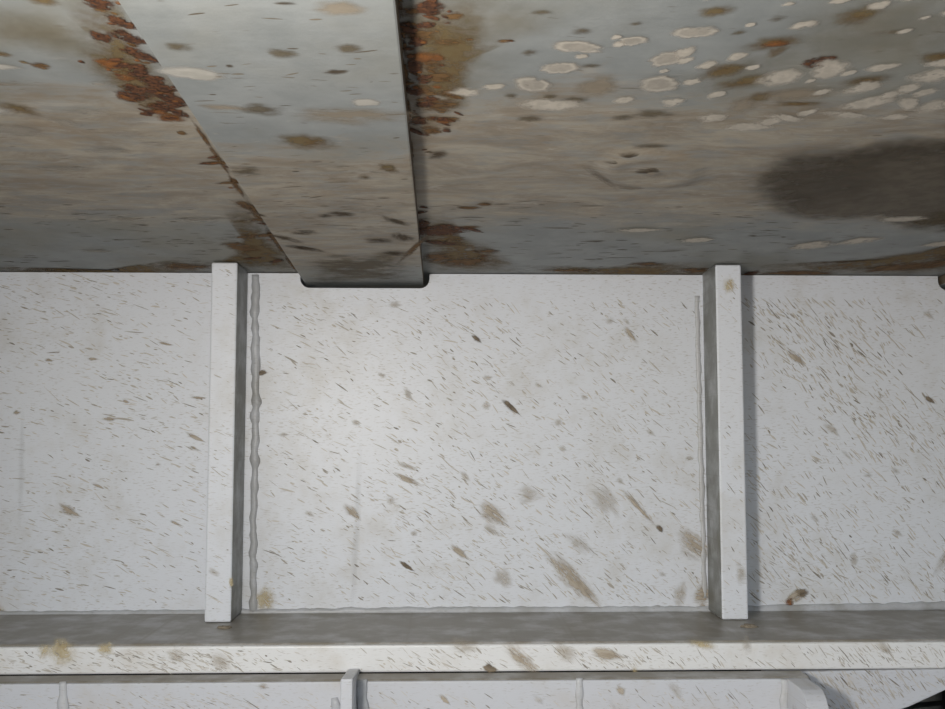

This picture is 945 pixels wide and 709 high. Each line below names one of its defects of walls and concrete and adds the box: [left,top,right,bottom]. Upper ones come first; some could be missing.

corrosion [78,0,313,269]
corrosion [320,206,501,278]
corrosion [398,0,482,158]
leakage [766,143,945,226]